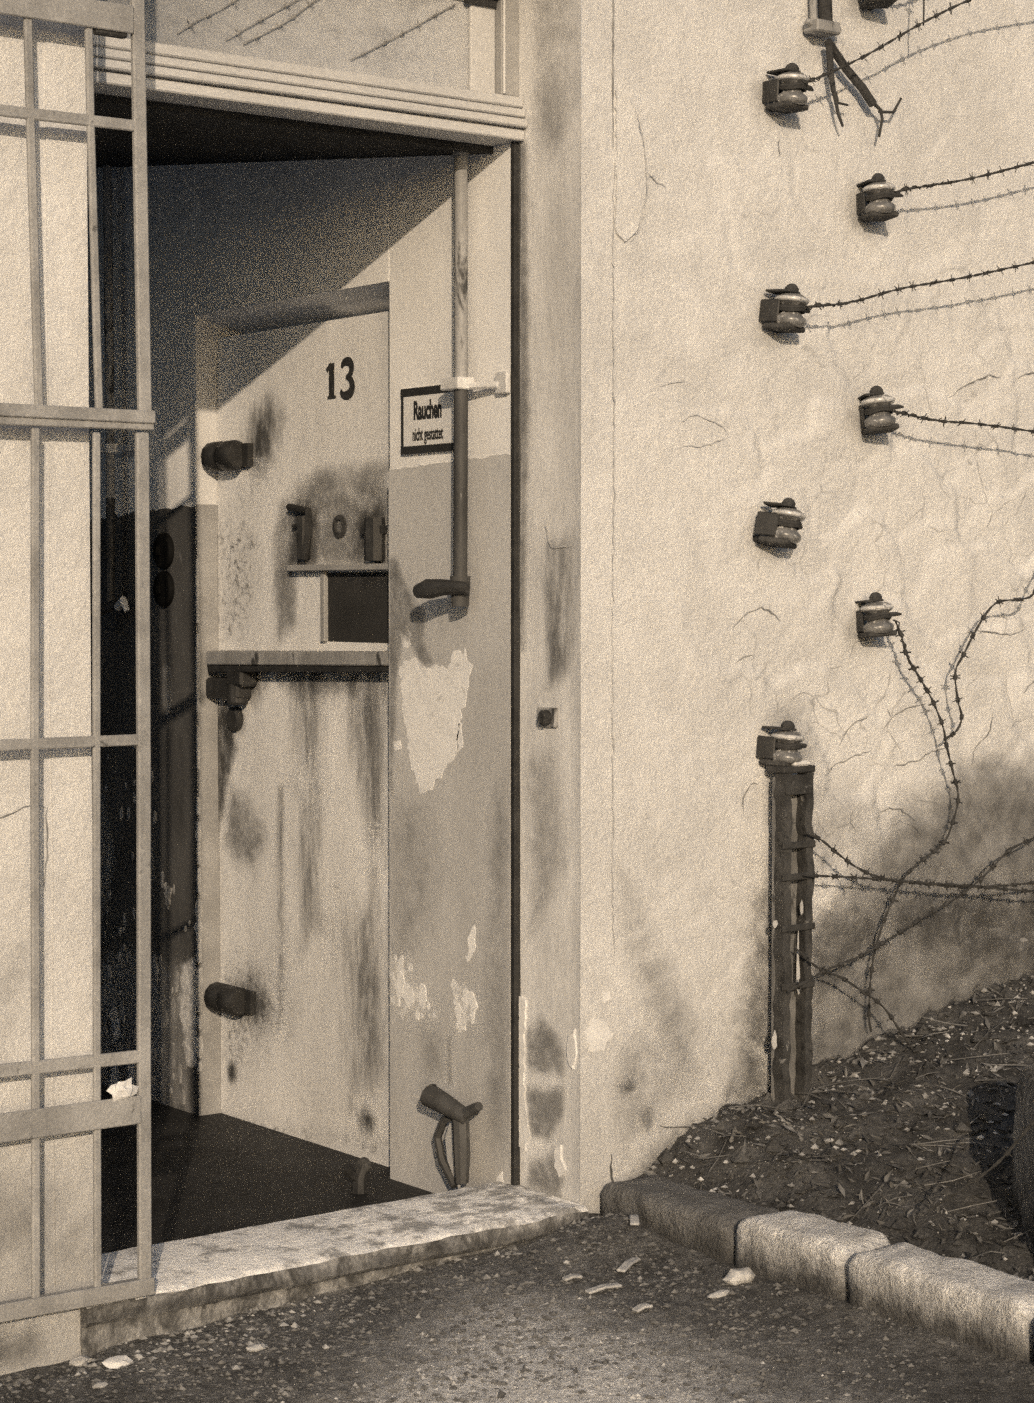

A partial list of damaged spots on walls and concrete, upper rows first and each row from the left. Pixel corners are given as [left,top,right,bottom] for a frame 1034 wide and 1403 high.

crack [950,372,1034,397]
crack [609,0,617,948]
peeling [277,469,473,794]
crack [733,606,781,663]
damp [292,672,379,827]
crack [825,704,993,776]
peeling [101,797,204,1107]
damp [358,926,376,1062]
peeling [389,955,436,1021]
peeling [450,979,478,1033]
peeling [465,925,476,962]
damp [811,772,1034,1064]